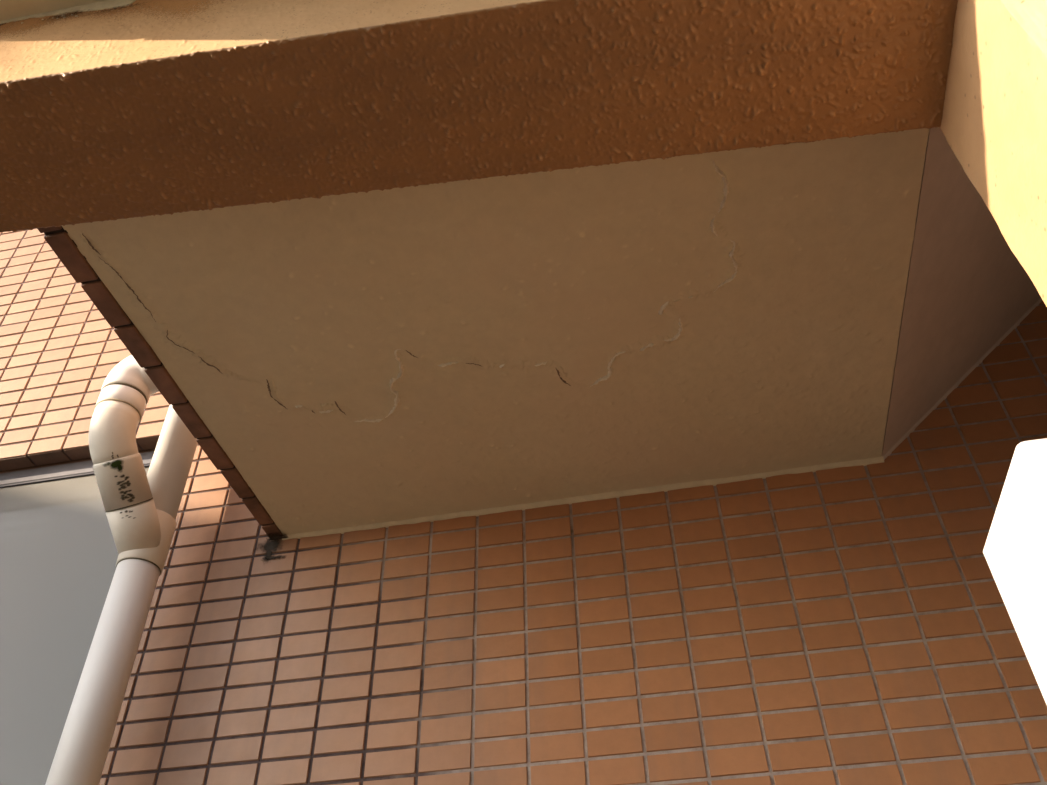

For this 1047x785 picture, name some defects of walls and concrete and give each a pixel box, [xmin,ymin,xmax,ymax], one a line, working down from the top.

crack [80,229,261,384]